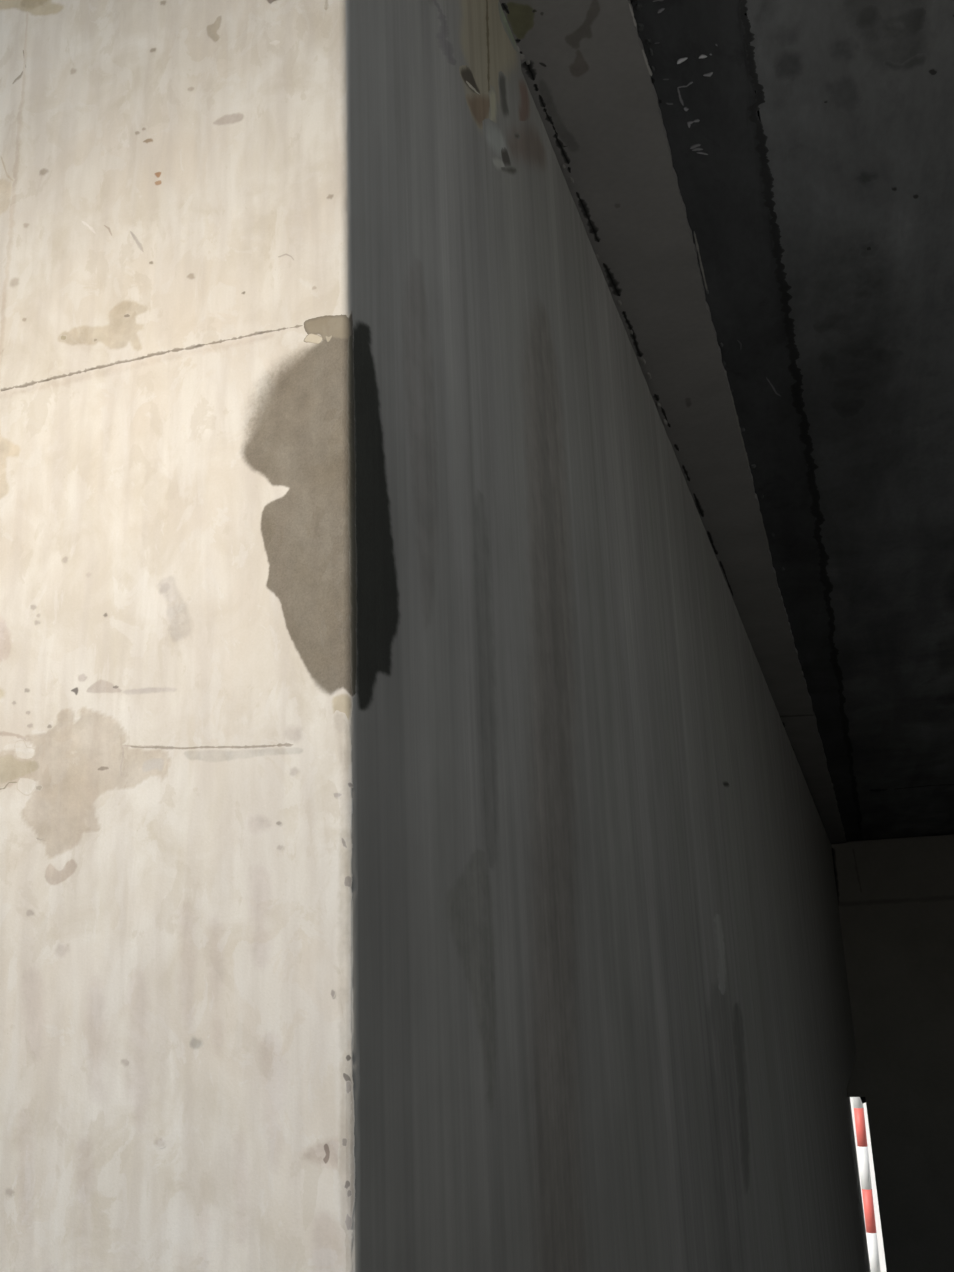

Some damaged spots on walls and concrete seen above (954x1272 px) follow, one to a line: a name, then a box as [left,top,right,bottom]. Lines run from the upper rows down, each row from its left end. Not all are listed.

water stain [0,0,65,18]
crack [0,11,303,401]
crack [0,730,31,741]
crack [121,742,304,764]